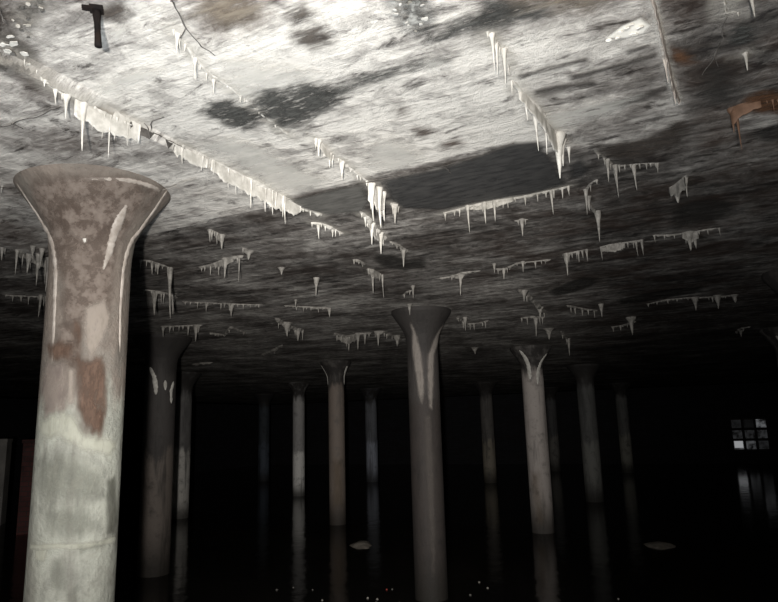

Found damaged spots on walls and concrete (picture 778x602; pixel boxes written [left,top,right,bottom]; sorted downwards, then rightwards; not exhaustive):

crack [170,0,215,56]
leakage [24,56,141,156]
rust [745,91,778,114]
leakage [172,0,690,297]
leakage [653,175,728,250]
leakage [0,184,57,345]
rust [32,177,157,438]
leakage [456,317,489,331]
leakage [517,289,572,356]
leakage [566,304,604,318]
leakage [611,316,637,335]
leakage [620,288,739,310]